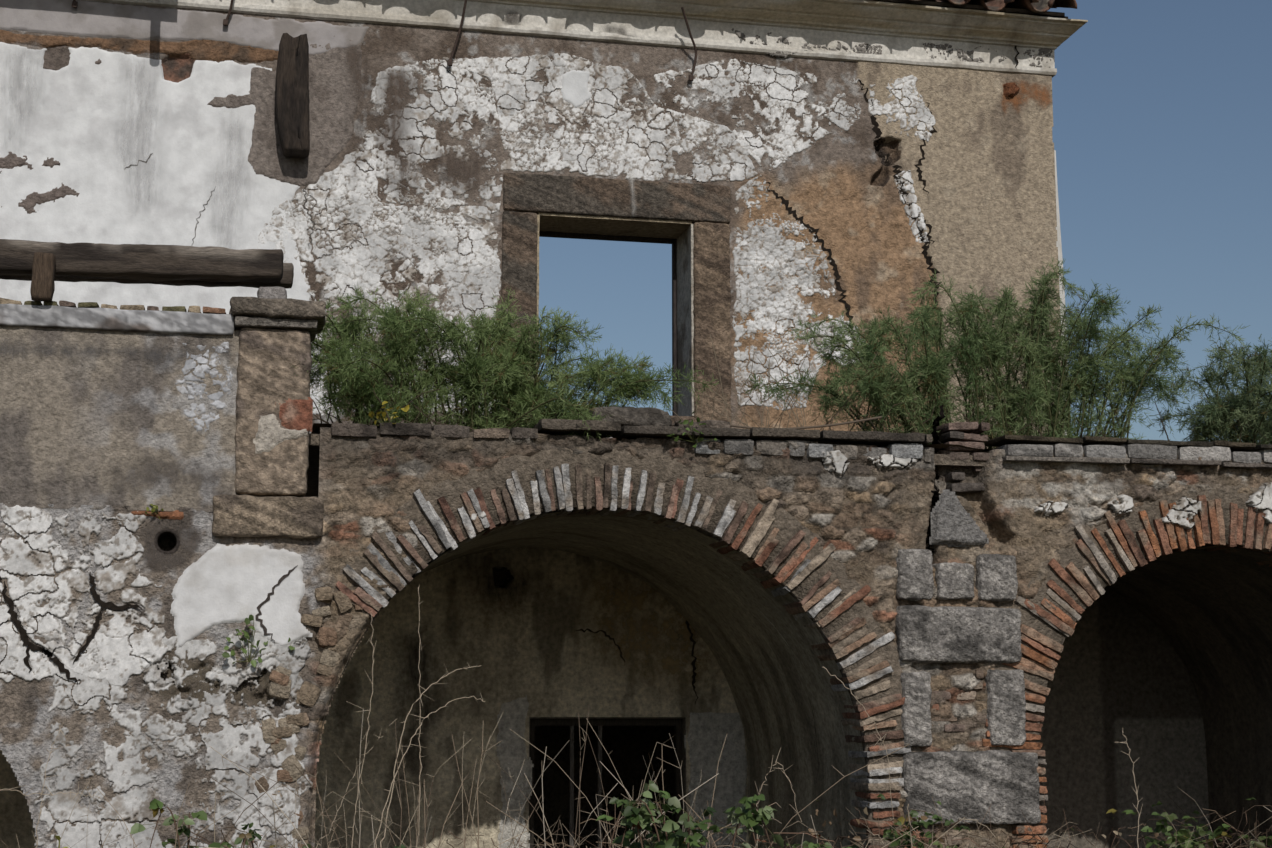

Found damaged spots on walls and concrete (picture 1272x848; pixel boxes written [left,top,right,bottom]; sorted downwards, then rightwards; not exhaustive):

peeling [923,43,1006,63]
peeling [1024,48,1053,68]
peeling [0,28,936,432]
crack [764,179,854,326]
crack [859,80,942,322]
crack [0,572,142,684]
peeling [0,502,313,848]
crack [255,565,298,642]